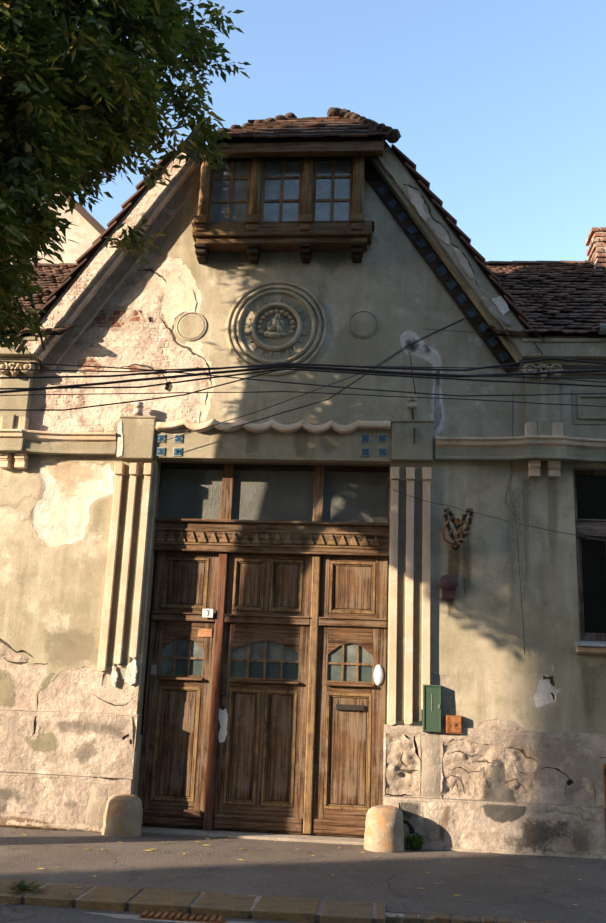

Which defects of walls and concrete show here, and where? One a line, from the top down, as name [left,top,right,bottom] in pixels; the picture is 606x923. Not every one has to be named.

flaking render [28,253,215,550]
flaking render [36,658,138,752]
flaking render [529,665,564,710]
damp [0,789,99,831]
damp [444,759,606,859]
crack [540,767,595,804]